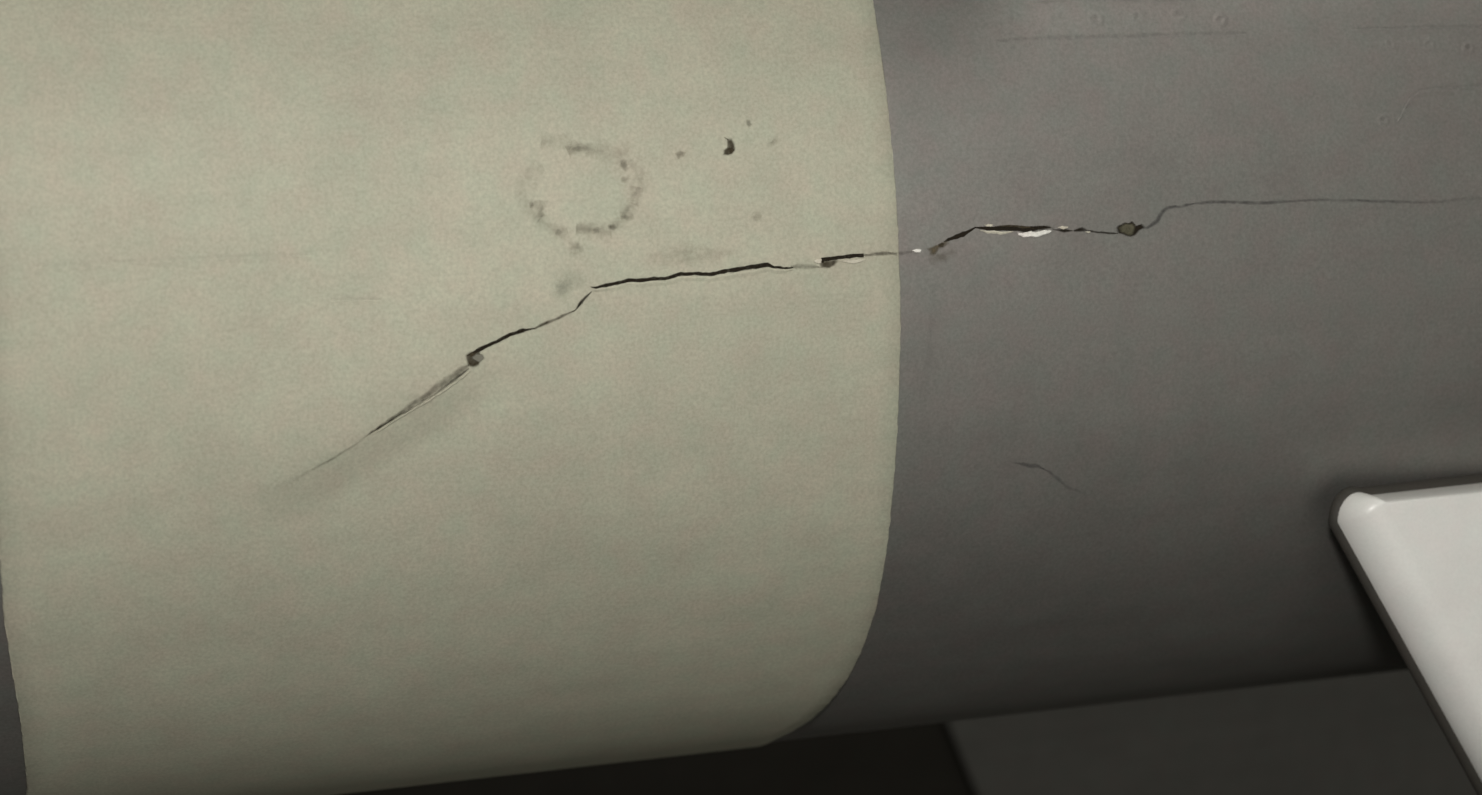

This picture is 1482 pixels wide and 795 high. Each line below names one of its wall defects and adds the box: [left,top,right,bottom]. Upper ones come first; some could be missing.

crack [374,201,1272,434]